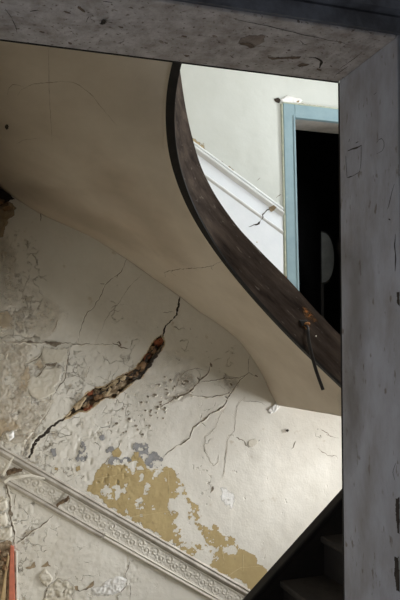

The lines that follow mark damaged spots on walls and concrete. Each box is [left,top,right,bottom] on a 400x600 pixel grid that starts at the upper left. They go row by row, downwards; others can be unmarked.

spalling [0,187,17,237]
peeling [26,341,68,400]
crack [0,259,180,459]
peeling [76,441,88,471]
peeling [87,373,267,590]
crack [160,359,262,493]
spalling [0,496,18,600]